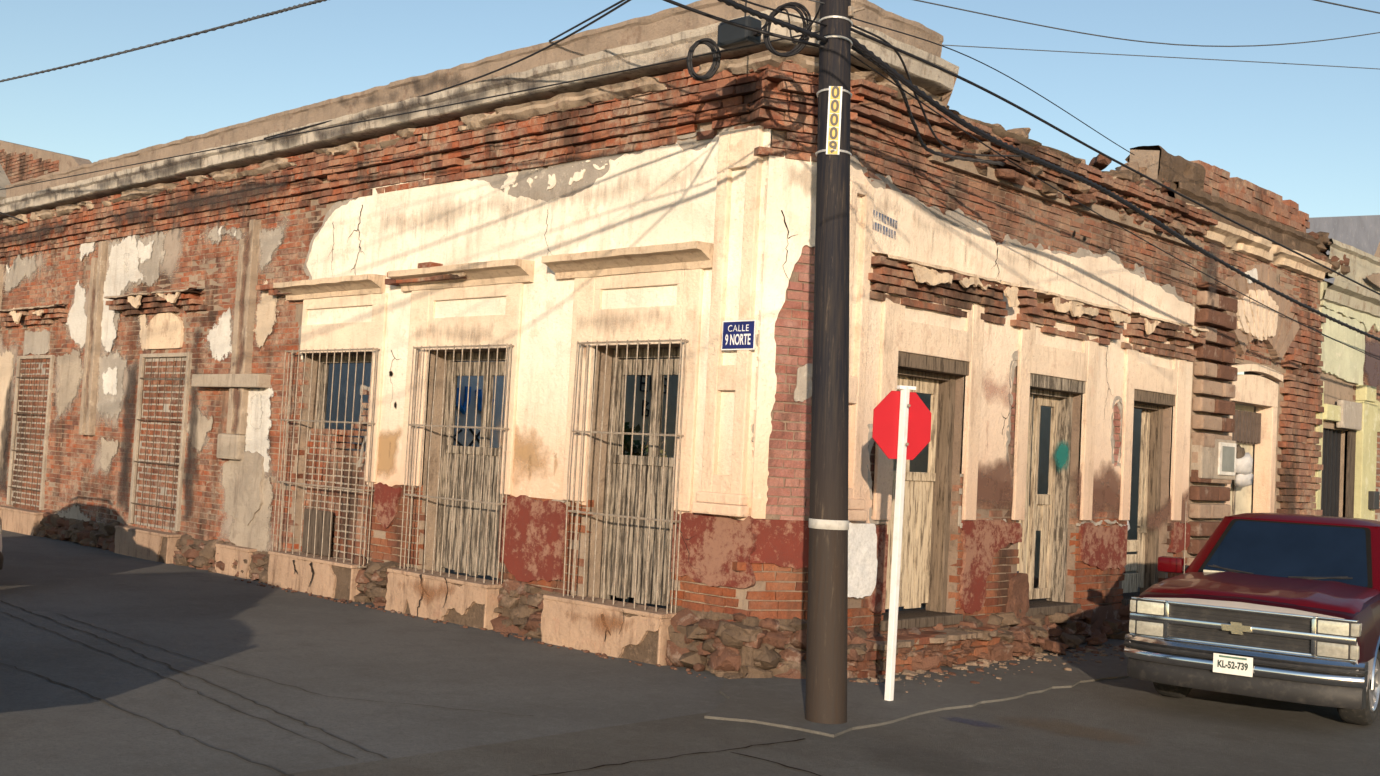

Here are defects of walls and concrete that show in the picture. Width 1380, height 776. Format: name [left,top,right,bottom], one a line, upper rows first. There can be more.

crack [329,205,364,275]
flaking render [497,160,610,198]
crack [781,210,798,285]
flaking render [850,131,1199,307]
peeling [1053,296,1201,337]
flaking render [0,204,326,552]
flaking render [766,246,815,521]
flaking render [358,385,426,565]
flaking render [498,495,594,594]
flaking render [670,574,751,622]
flaking render [948,477,1022,619]
flaking render [1067,499,1127,610]